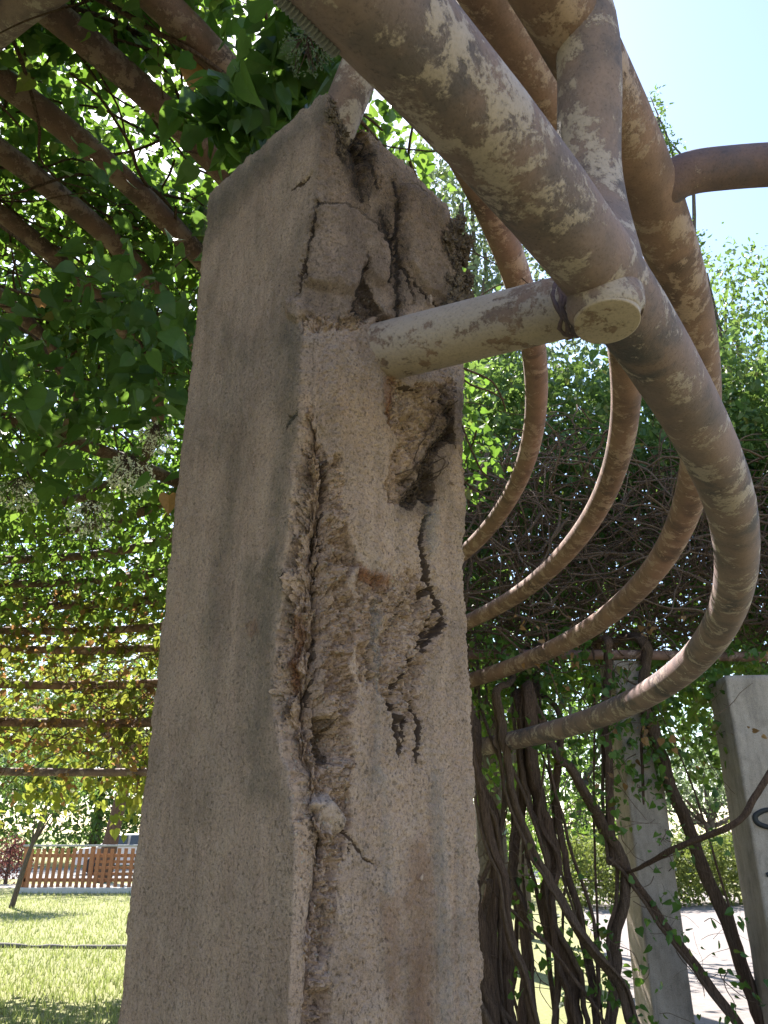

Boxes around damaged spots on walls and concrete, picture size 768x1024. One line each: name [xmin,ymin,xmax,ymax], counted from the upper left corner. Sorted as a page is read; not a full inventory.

crack [291,148,436,317]
crack [387,378,440,403]
spalling [269,301,457,1024]
crack [385,512,447,764]